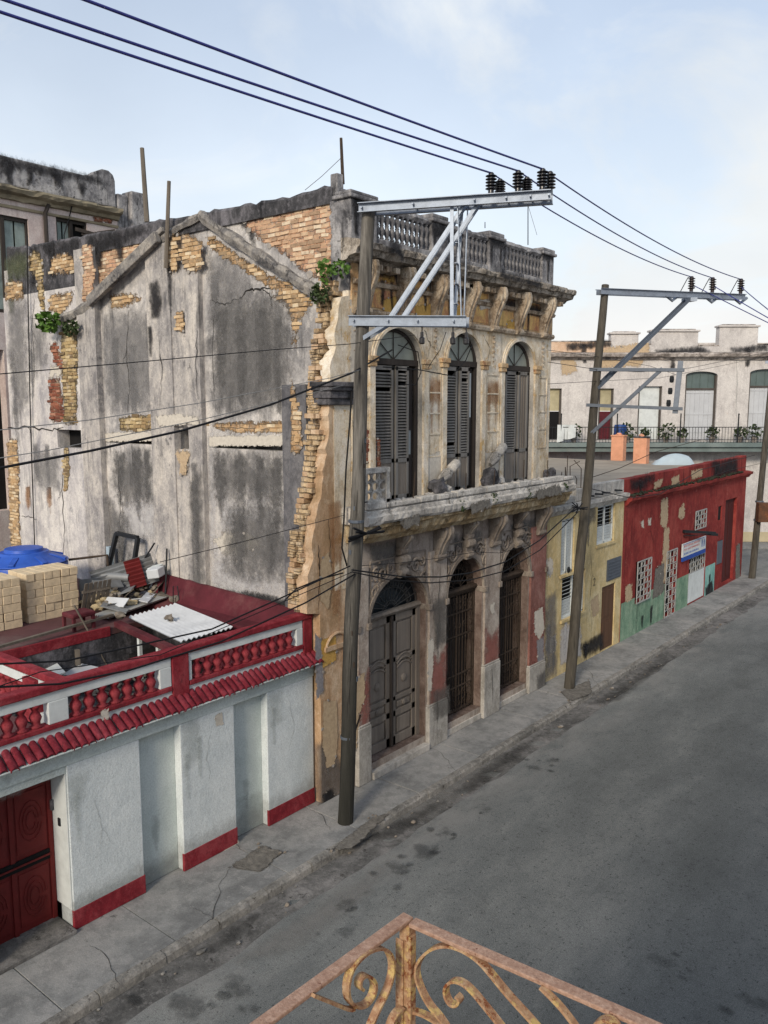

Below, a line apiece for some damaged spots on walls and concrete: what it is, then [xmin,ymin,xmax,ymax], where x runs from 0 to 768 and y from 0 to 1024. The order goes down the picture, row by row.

flaking render [47,328,78,426]
spalling [105,204,356,612]
crack [189,281,288,407]
water stain [108,452,155,564]
water stain [190,430,284,594]
peeling [314,633,338,768]
water stain [537,595,604,689]
peeling [625,583,633,603]
peeling [641,468,703,600]